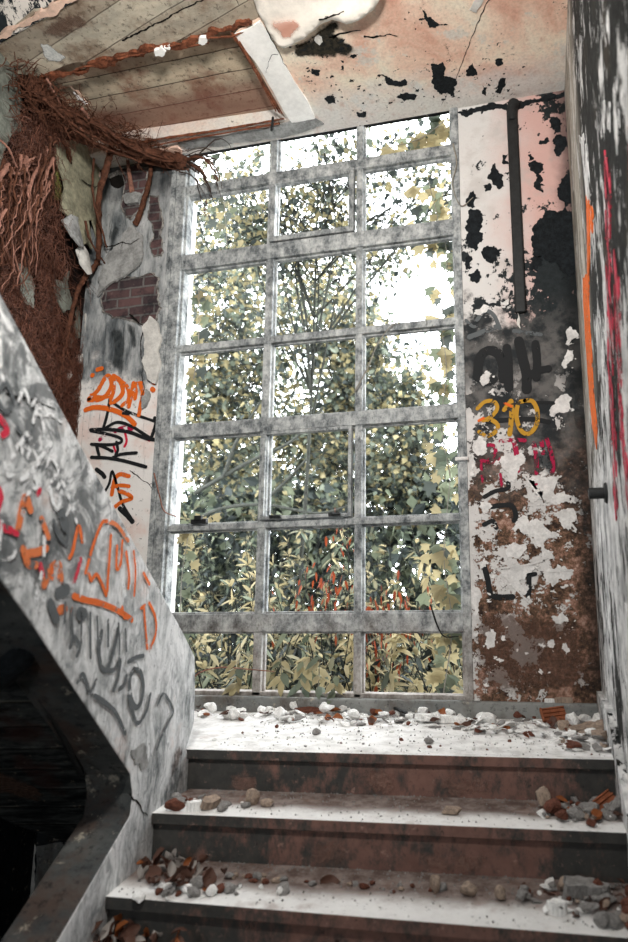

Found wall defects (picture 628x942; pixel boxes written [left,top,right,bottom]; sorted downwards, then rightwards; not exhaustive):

spalling [0,0,259,76]
flaking render [304,58,565,118]
crack [442,0,490,103]
peeling [528,154,544,193]
peeling [539,117,568,156]
peeling [465,154,509,284]
peeling [529,174,575,284]
spalling [54,140,164,409]
peeling [480,371,495,396]
peeling [549,394,574,430]
peeling [562,326,579,369]
peeling [467,436,577,687]